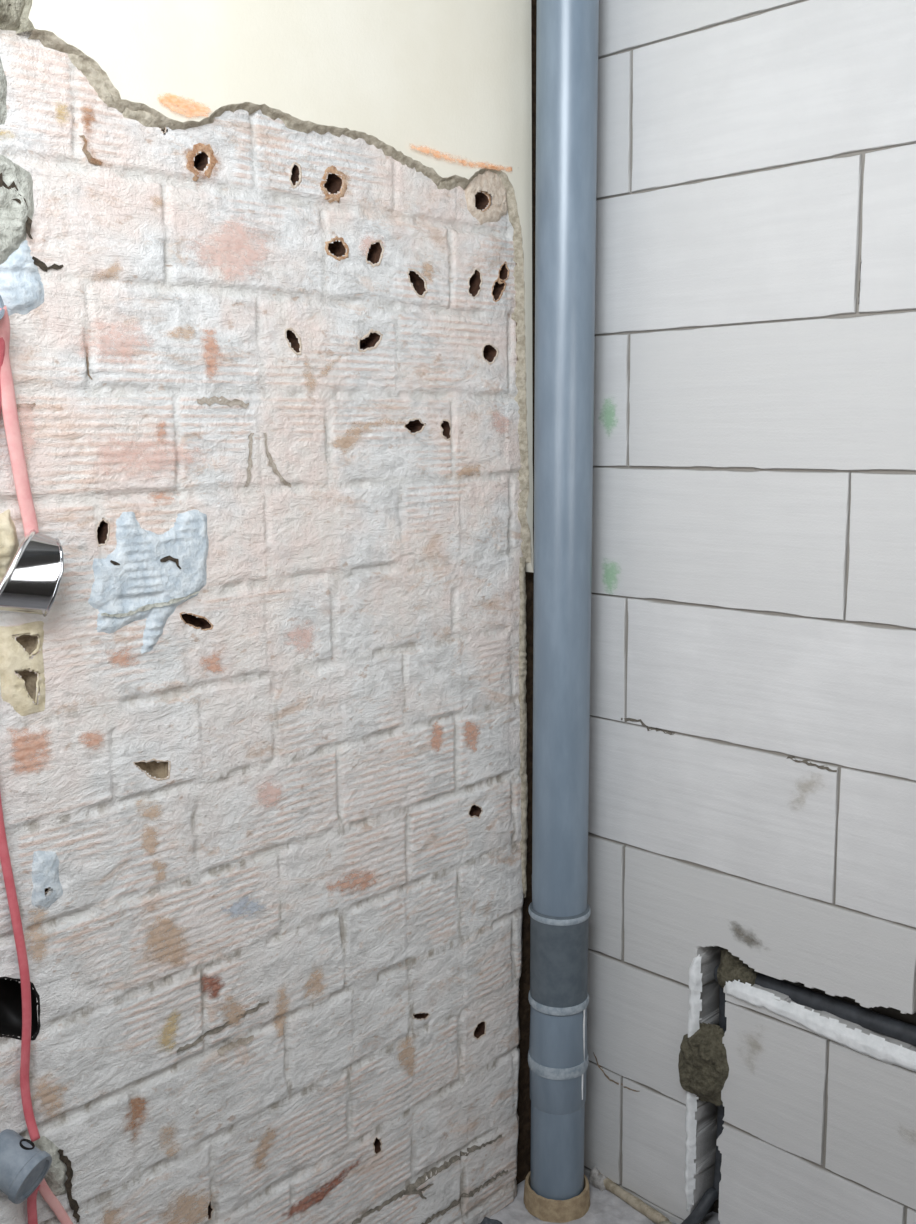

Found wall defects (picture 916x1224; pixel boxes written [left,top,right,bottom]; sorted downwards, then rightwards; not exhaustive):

flaking render [16,0,532,563]
spalling [179,612,213,631]
spalling [12,632,41,705]
spalling [133,758,171,781]
spalling [468,804,483,819]
peeling [201,975,245,1023]
crack [177,1001,269,1056]
spalling [412,1012,430,1021]
spalling [473,1021,486,1040]
spalling [373,1137,382,1155]
spalling [283,1160,360,1217]
crack [352,1135,508,1224]